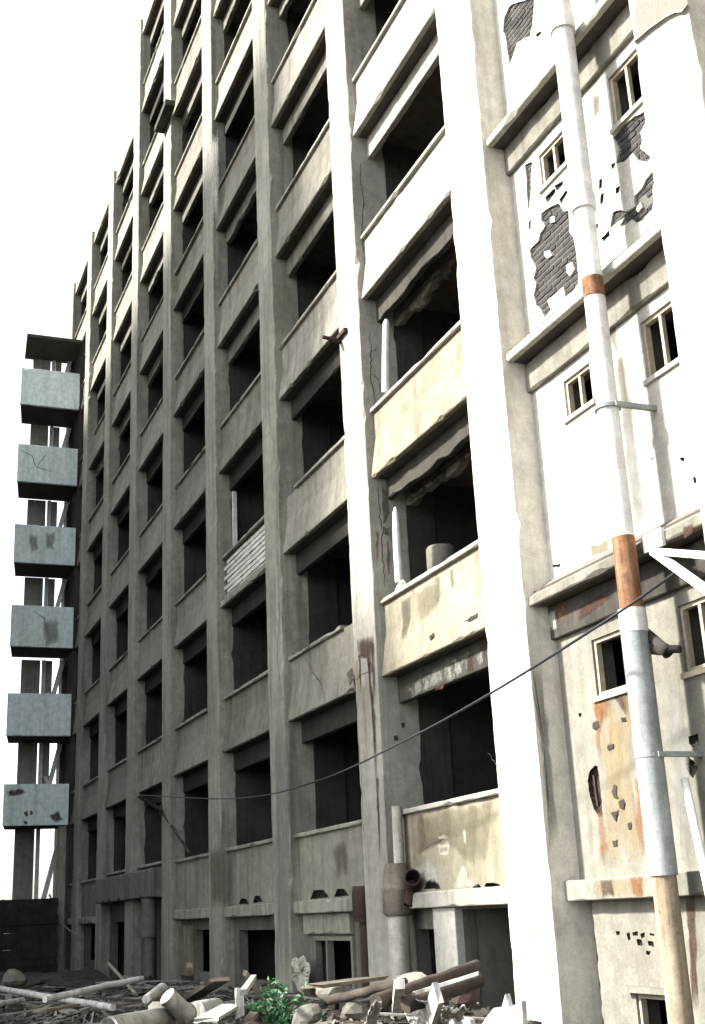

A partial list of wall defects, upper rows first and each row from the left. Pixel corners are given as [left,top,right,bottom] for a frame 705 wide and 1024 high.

spalling [505,0,541,59]
spalling [611,114,651,169]
spalling [596,174,654,241]
spalling [529,181,578,315]
crack [369,339,381,403]
crack [344,478,392,613]
corrosion [358,638,376,765]
peeling [415,651,483,694]
corrosion [594,694,628,789]
spalling [588,766,632,830]
corrosion [621,781,642,833]
spalling [616,931,654,955]